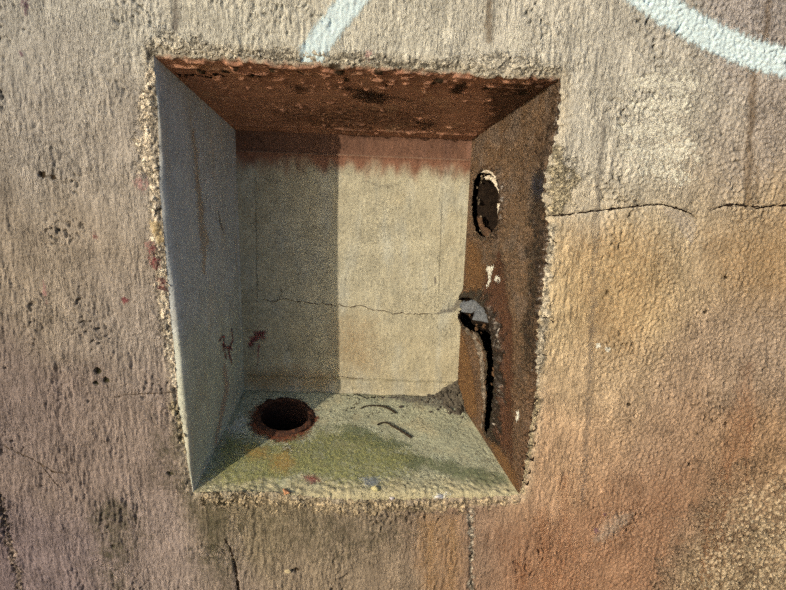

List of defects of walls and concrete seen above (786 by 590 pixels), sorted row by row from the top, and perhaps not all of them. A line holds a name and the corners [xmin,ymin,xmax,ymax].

spalling [131,26,562,454]
crack [544,203,786,243]
crack [257,290,438,315]
spalling [198,142,589,590]
corrosion [458,330,476,417]
corrosion [465,241,518,489]
crack [224,539,240,590]